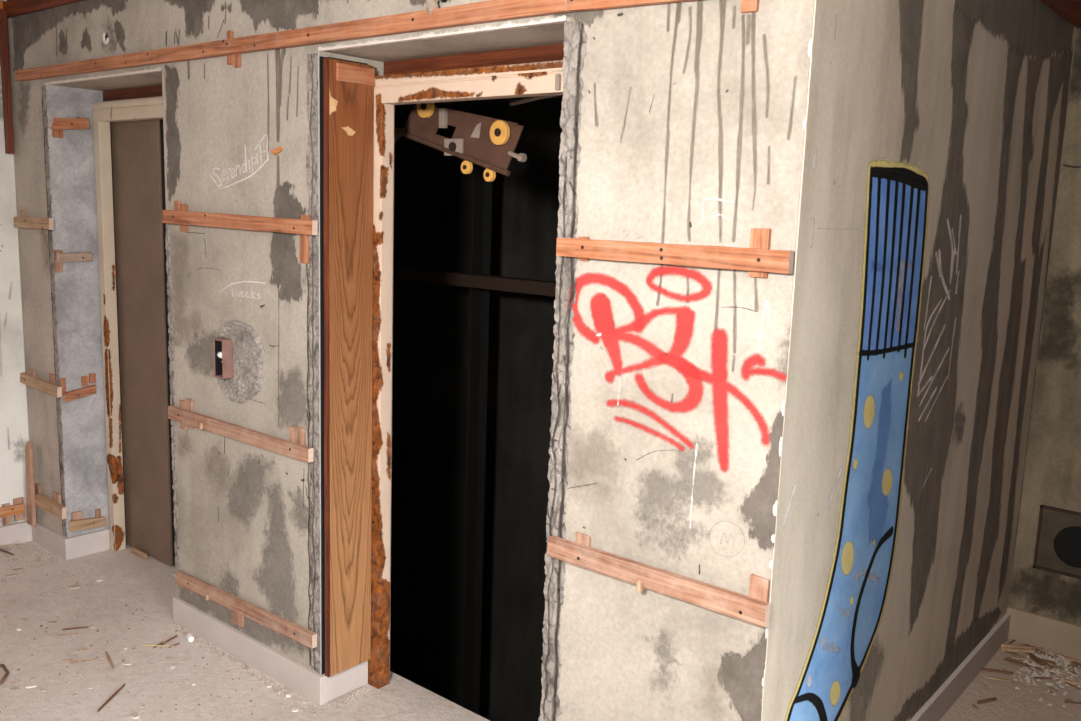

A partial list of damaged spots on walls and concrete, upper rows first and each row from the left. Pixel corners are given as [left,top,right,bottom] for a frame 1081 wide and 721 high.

corrosion [375,93,393,198]
corrosion [375,61,563,102]
water stain [665,0,703,241]
water stain [717,0,770,242]
corrosion [103,265,124,504]
corrosion [112,525,124,551]
spalling [217,319,265,404]
water stain [206,449,309,618]
corrosion [368,212,391,689]
spalling [306,15,587,721]
water stain [640,443,722,548]
water stain [894,0,1081,721]